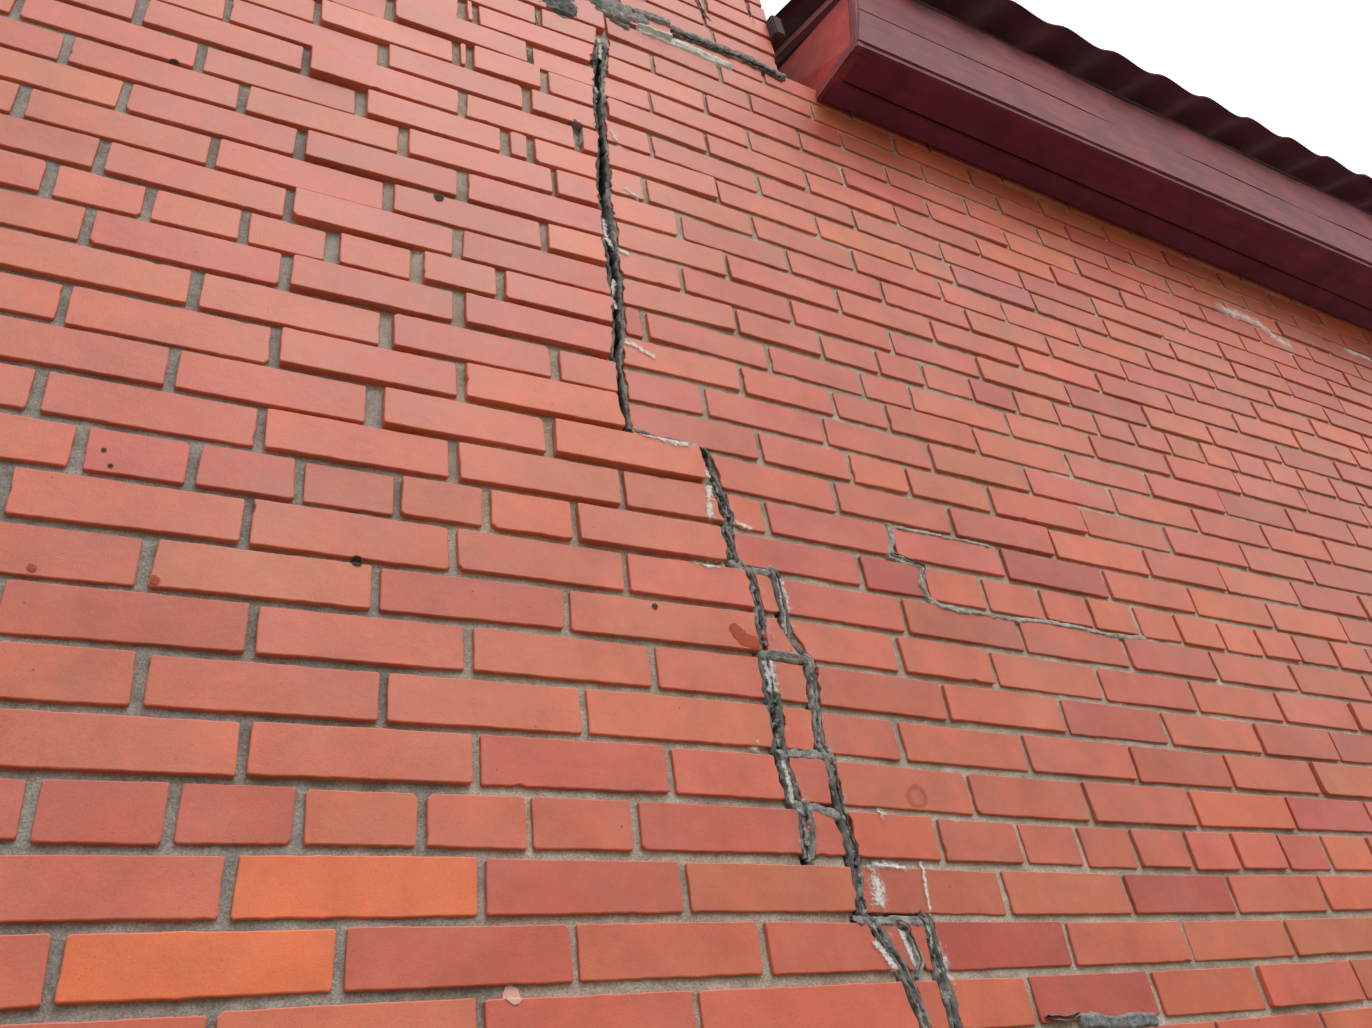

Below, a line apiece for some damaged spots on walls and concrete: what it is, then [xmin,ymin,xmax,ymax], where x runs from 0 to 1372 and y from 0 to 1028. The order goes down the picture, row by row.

crack [535,0,963,1028]